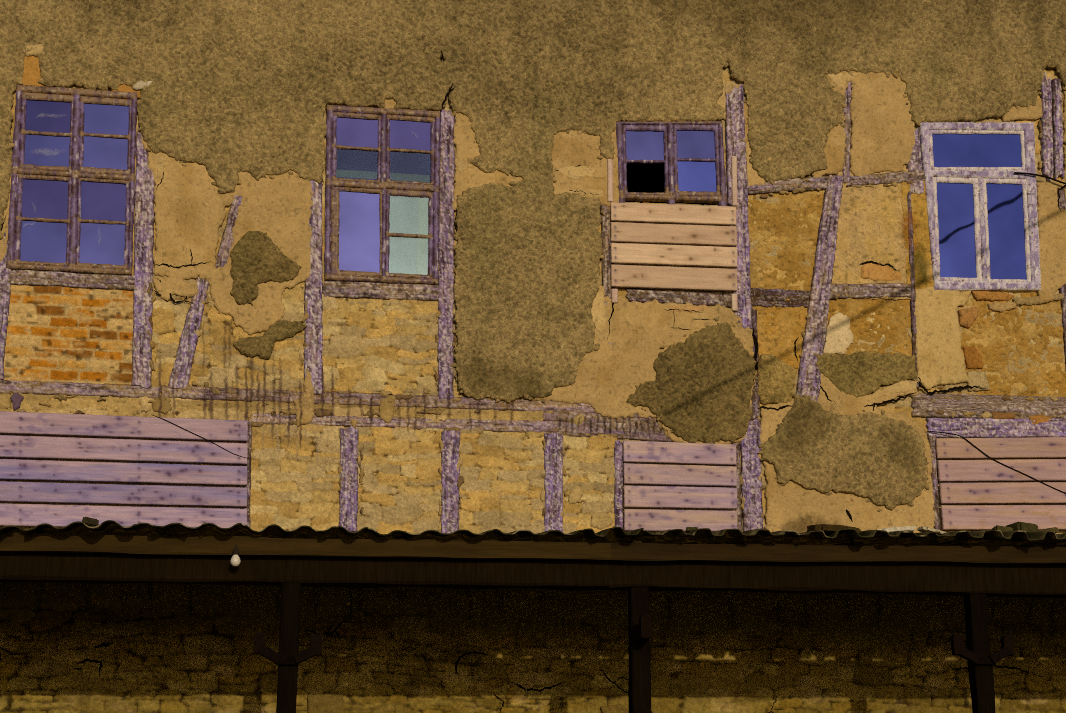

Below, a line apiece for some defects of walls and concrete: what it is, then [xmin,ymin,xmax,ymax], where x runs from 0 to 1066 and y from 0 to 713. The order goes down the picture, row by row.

flaking render [452,111,523,211]
flaking render [551,129,619,207]
flaking render [744,103,765,186]
flaking render [0,177,11,261]
flaking render [141,137,313,335]
flaking render [750,71,1066,533]
flaking render [533,284,754,444]
crack [74,642,115,676]
crack [455,651,488,675]
crack [493,682,564,713]
crack [600,669,628,693]
crack [993,665,1041,677]